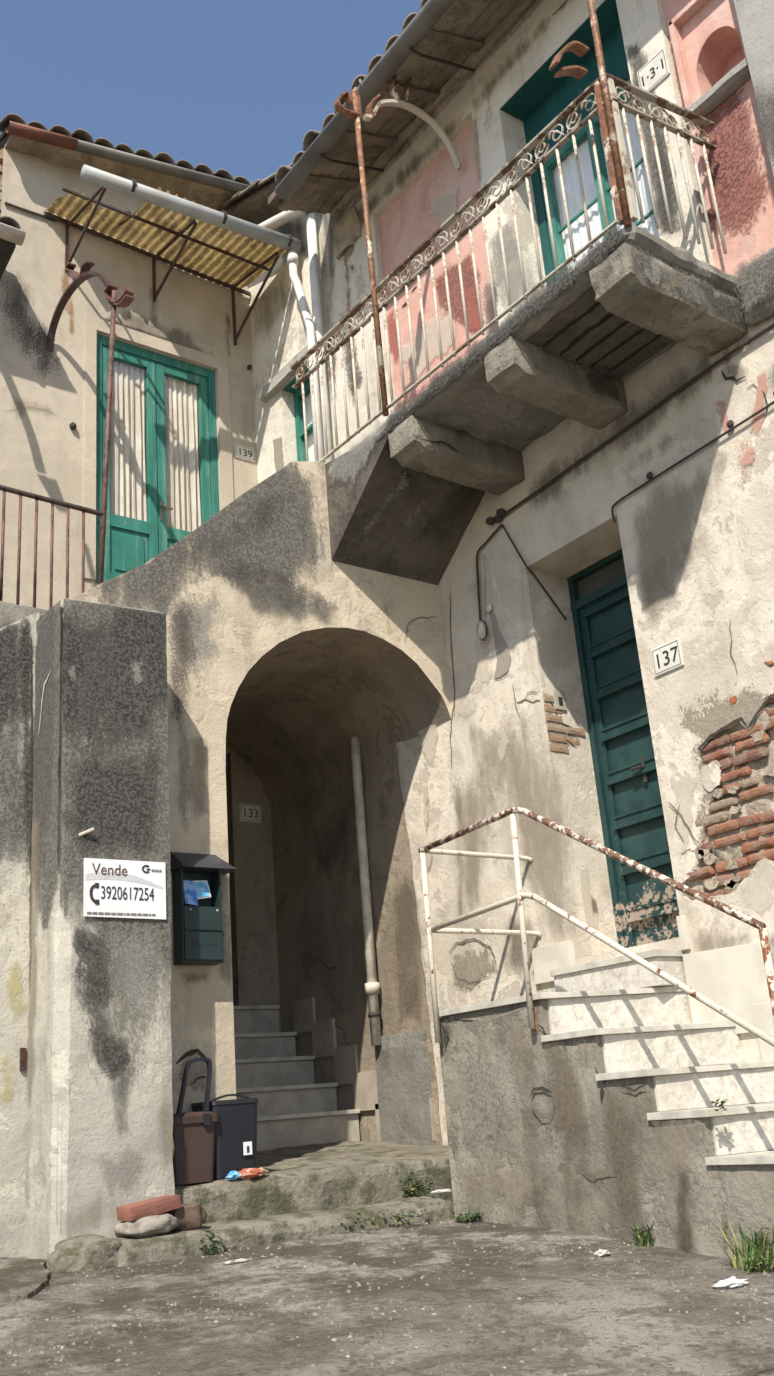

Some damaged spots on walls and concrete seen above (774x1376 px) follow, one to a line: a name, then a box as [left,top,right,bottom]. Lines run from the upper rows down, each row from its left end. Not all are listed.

damp [628,44,680,233]
damp [685,78,774,237]
damp [0,213,774,1125]
spalling [543,694,585,753]
spalling [668,682,774,900]
damp [671,1120,690,1248]